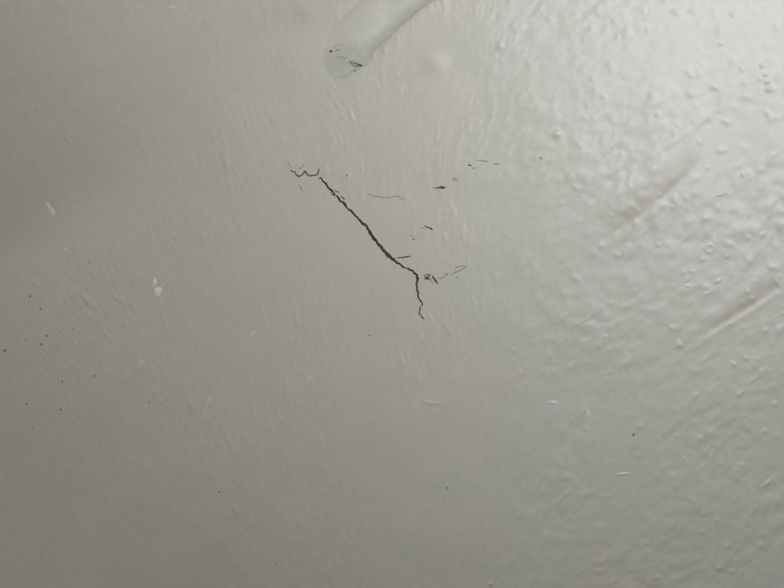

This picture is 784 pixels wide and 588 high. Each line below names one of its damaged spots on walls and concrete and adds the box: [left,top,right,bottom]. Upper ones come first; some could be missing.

crack [288,163,433,324]
crack [431,160,501,189]